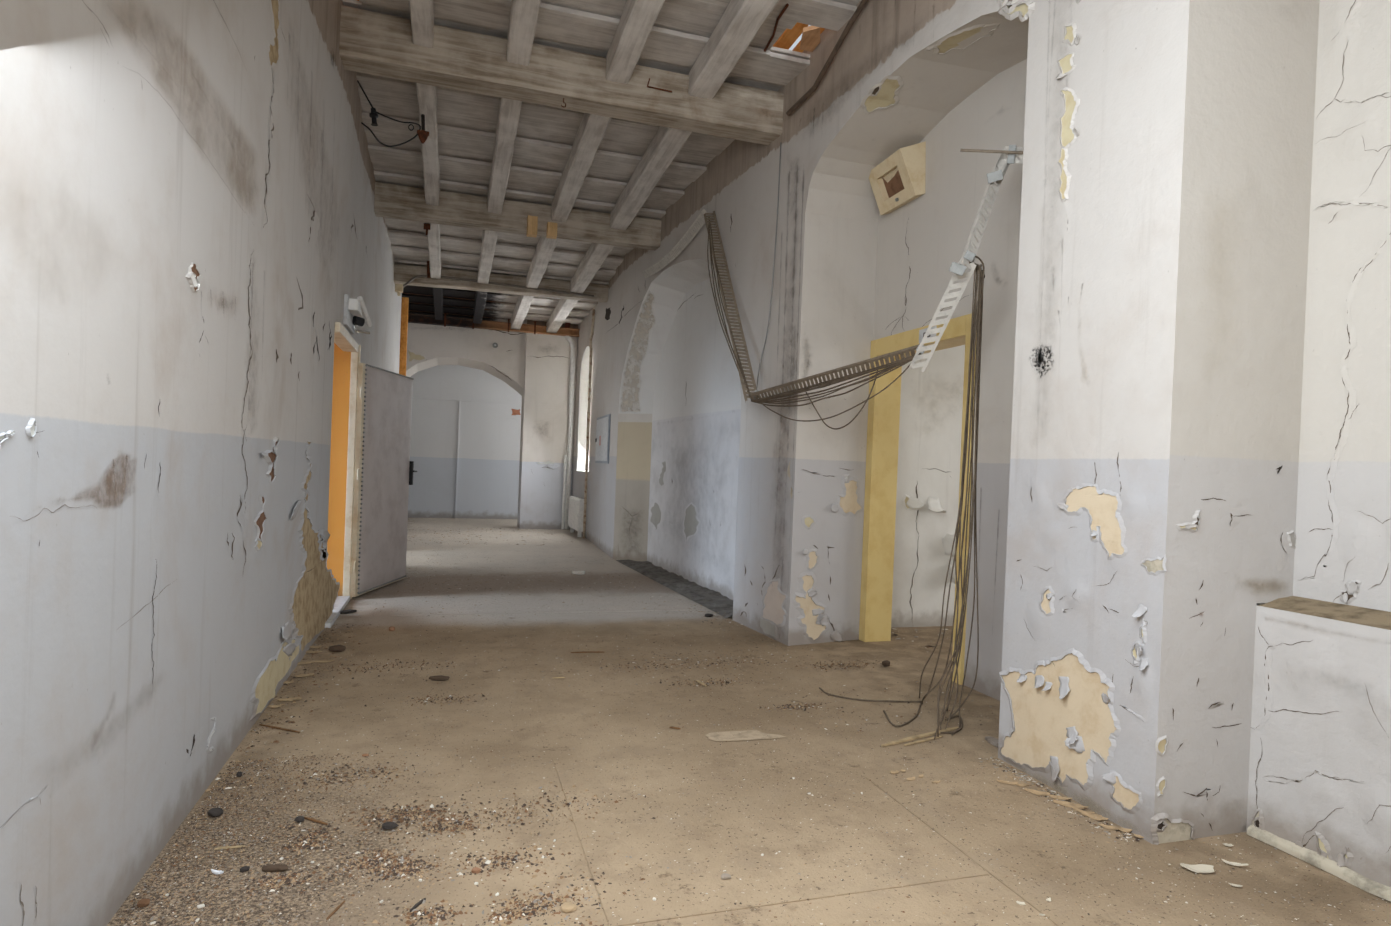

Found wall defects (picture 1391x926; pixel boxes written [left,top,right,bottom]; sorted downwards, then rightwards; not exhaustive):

peeling [924,0,1035,55]
peeling [1056,22,1080,203]
crack [134,0,278,570]
crack [1298,0,1391,604]
peeling [0,418,37,447]
crack [117,561,177,691]
peeling [249,437,340,722]
peeling [998,648,1195,845]
peeling [1057,483,1167,576]
crack [1112,659,1183,751]
crack [1183,788,1220,831]
crack [1189,582,1391,853]